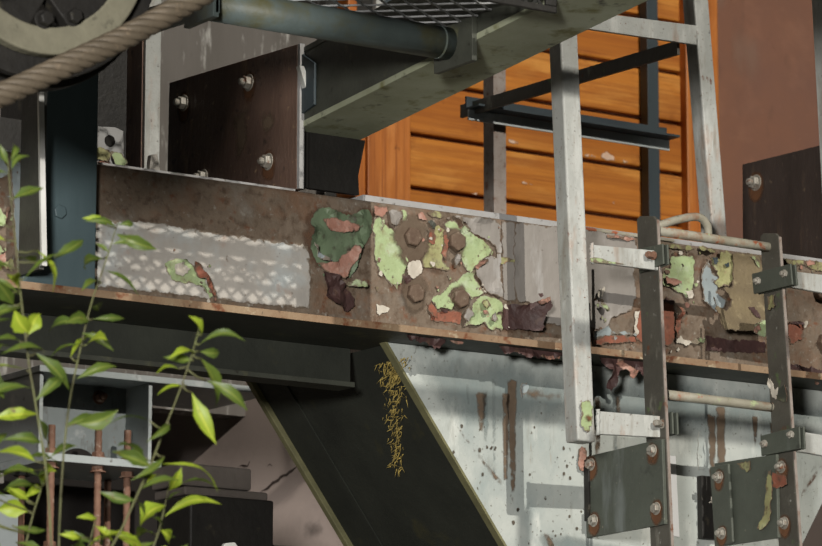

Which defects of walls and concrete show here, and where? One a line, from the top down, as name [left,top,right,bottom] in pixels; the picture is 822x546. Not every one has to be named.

peeling [0,157,21,272]
peeling [95,206,561,335]
peeling [586,229,642,349]
peeling [661,243,733,353]
peeling [599,357,644,391]
peeling [767,378,787,402]
peeling [790,364,822,385]